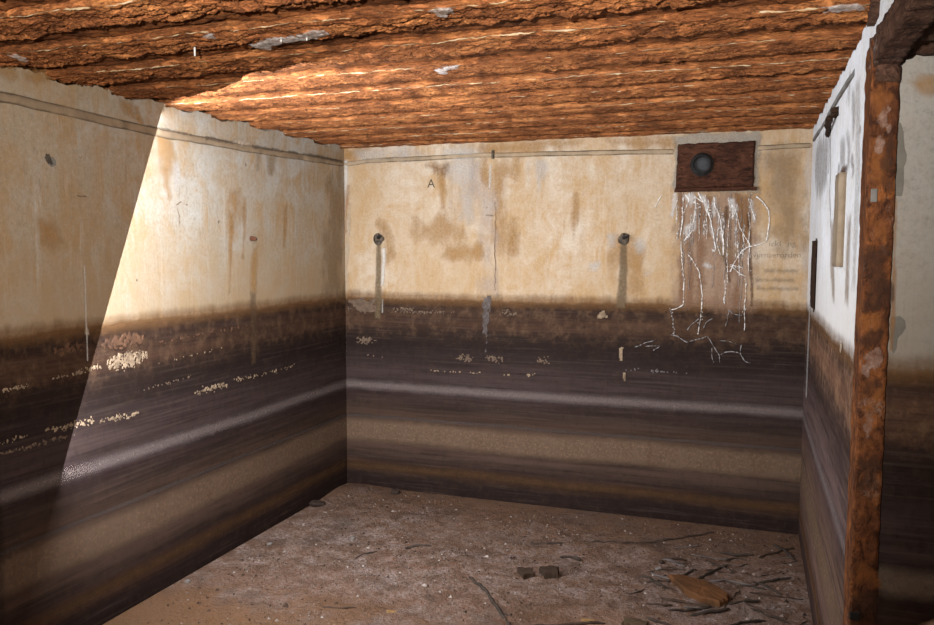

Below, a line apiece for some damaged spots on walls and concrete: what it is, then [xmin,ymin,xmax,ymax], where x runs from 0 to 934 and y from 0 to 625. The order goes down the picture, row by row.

damp [0,158,854,625]